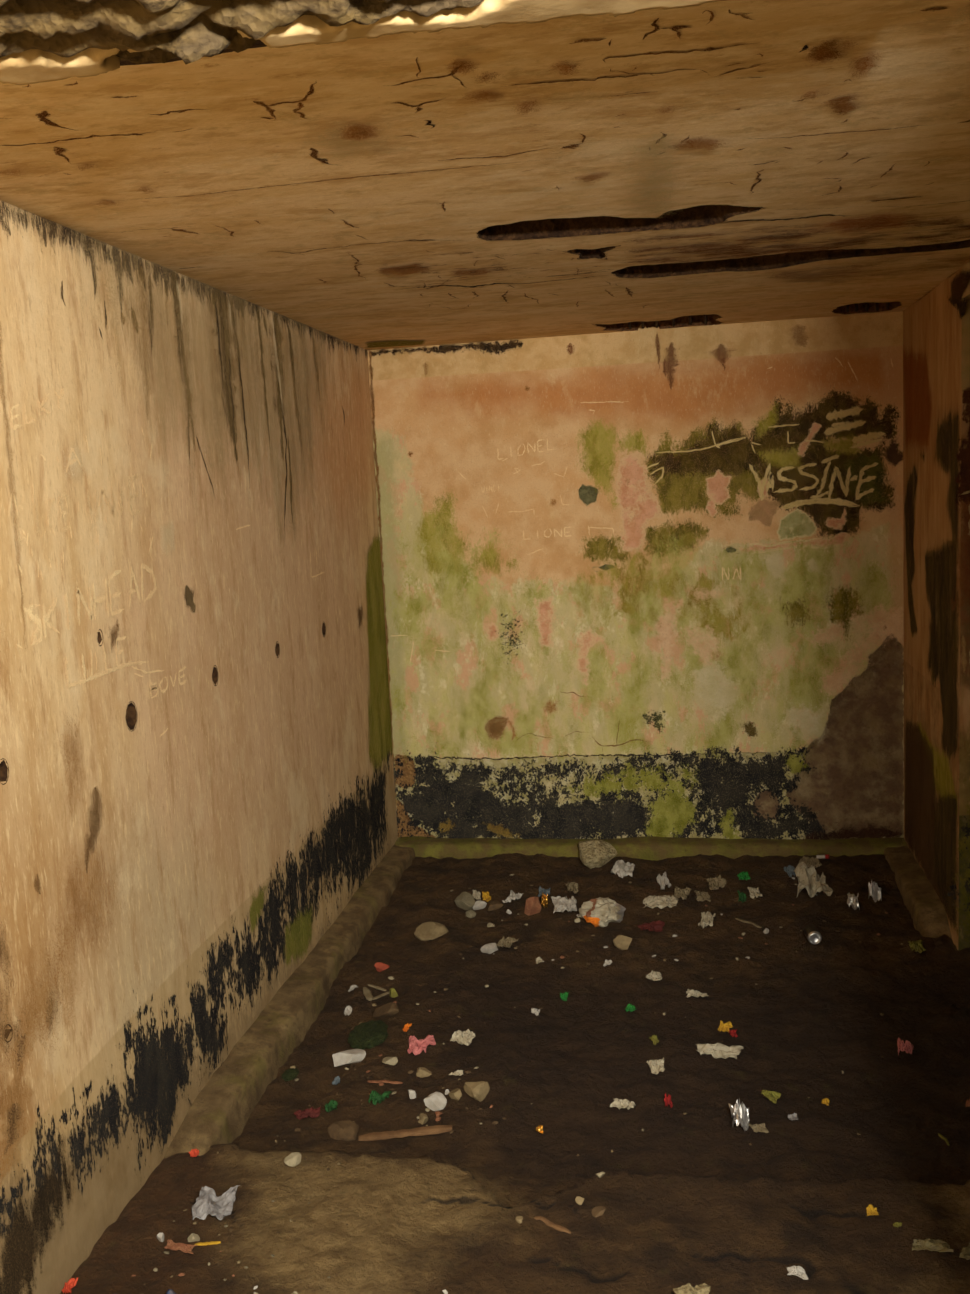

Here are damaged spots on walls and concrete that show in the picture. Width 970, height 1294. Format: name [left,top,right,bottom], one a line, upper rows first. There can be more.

peeling [0,48,182,85]
peeling [221,0,726,54]
crack [0,84,206,175]
crack [118,10,769,309]
crack [723,108,970,223]
spalling [477,205,970,278]
spalling [592,314,723,331]
leakage [0,201,523,564]
leakage [647,387,970,931]
leakage [642,710,666,734]
peeling [0,630,904,1239]
leakage [0,1132,86,1294]